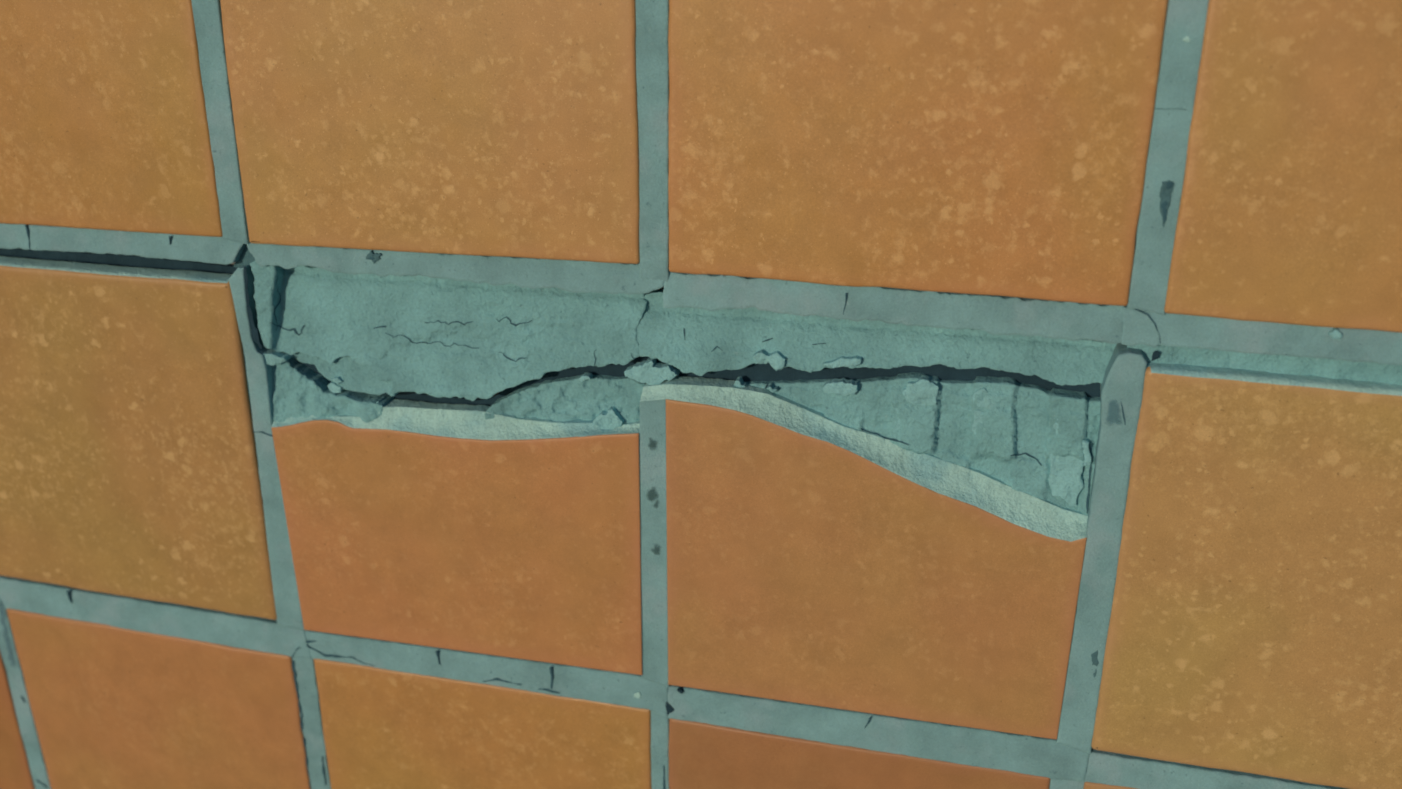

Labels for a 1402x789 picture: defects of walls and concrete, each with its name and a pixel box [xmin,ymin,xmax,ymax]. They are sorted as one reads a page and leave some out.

crack [241,267,262,349]
crack [300,362,332,383]
crack [383,356,1125,423]
spalling [233,246,1116,740]